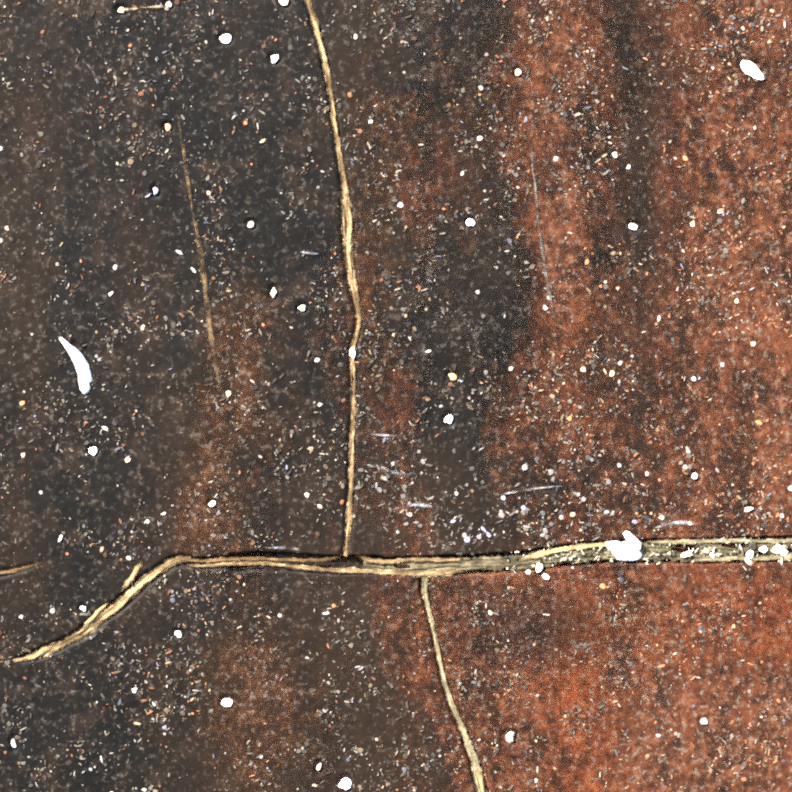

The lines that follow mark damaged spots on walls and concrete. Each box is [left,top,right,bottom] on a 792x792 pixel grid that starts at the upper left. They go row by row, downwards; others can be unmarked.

crack [0,0,617,792]
crack [636,536,792,563]